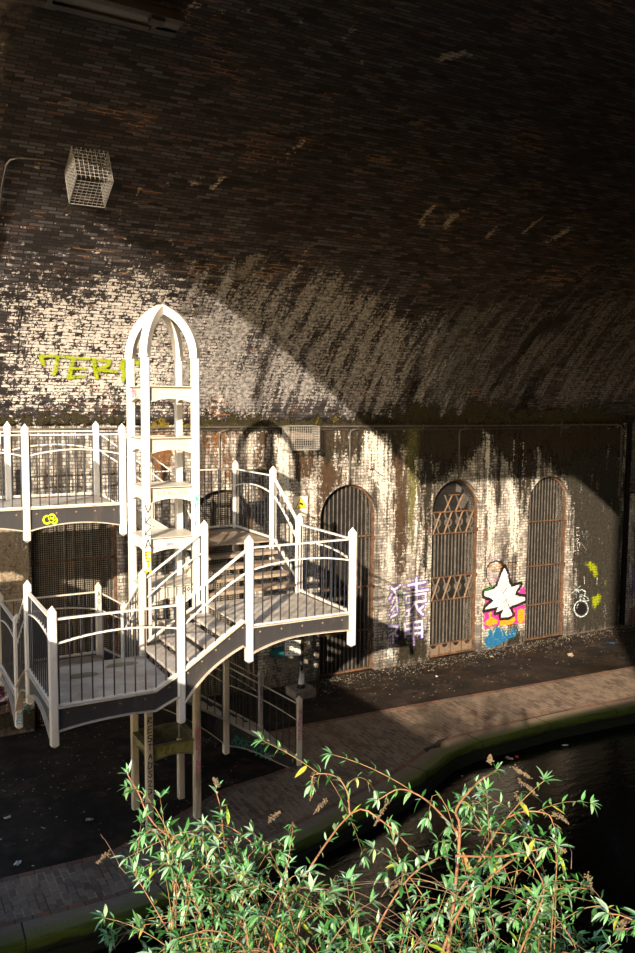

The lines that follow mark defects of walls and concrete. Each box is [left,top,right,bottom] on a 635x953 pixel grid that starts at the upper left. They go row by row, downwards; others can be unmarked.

damp [150,417,169,427]
damp [183,313,628,665]
damp [0,707,35,733]